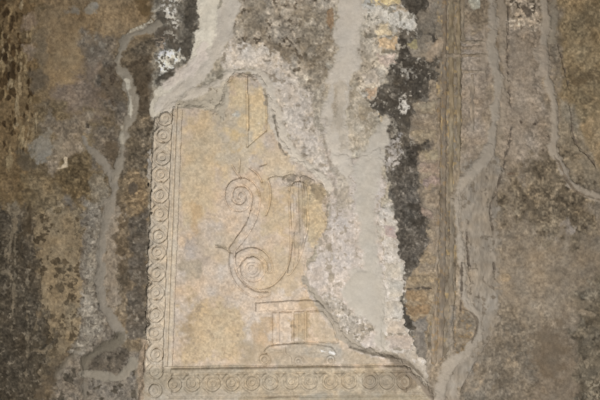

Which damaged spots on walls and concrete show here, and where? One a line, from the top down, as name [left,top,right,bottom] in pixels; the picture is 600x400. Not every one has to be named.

crack [52,17,164,400]
spalling [234,0,336,97]
spalling [300,124,376,347]
flaking render [346,19,402,159]
flaking render [370,0,409,13]
damp [362,0,446,280]
damp [400,293,415,339]
crack [300,0,516,400]
flaking render [376,95,443,377]
crack [528,0,600,204]